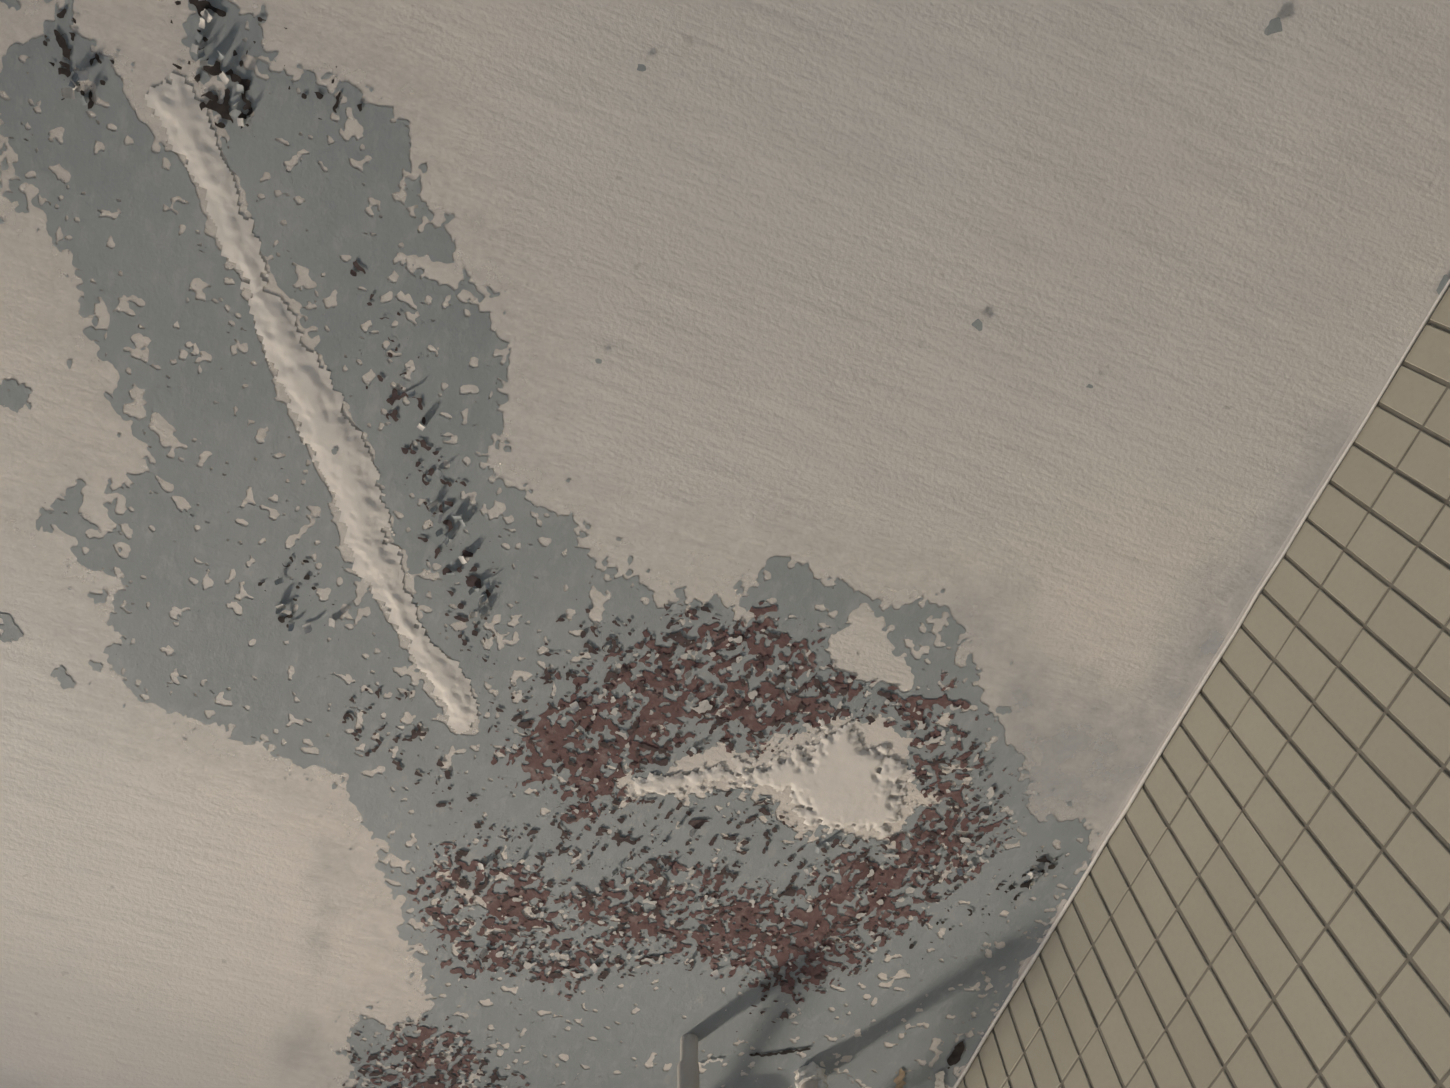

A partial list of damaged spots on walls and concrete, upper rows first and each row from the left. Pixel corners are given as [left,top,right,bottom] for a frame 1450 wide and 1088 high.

peeling [0,0,1100,1088]